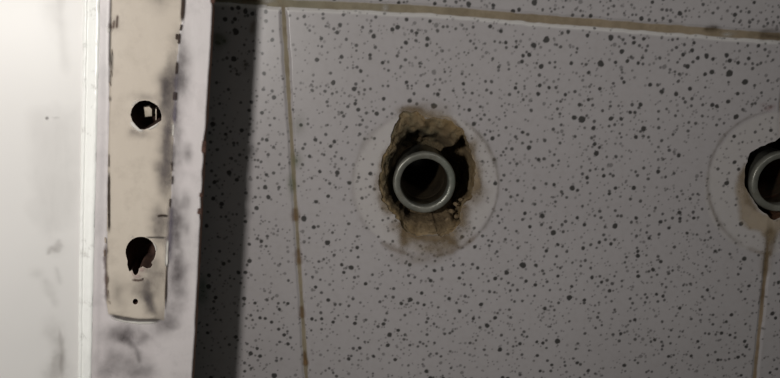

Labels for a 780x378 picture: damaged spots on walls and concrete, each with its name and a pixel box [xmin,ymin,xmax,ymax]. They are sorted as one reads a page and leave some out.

spalling [378,108,481,243]
spalling [745,192,780,220]